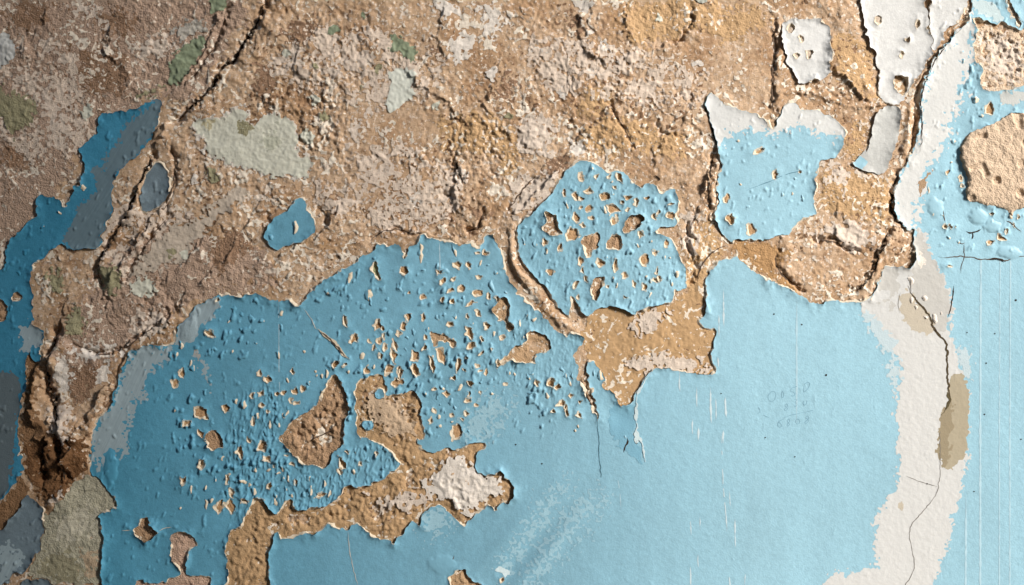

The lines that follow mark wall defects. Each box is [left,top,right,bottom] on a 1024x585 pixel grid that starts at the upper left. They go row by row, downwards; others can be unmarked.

peeling [0,0,239,585]
crack [98,154,176,285]
crack [177,2,268,120]
spalling [236,9,366,125]
spalling [212,34,551,585]
spalling [480,53,579,130]
peeling [513,0,1024,465]
crack [898,210,1023,585]